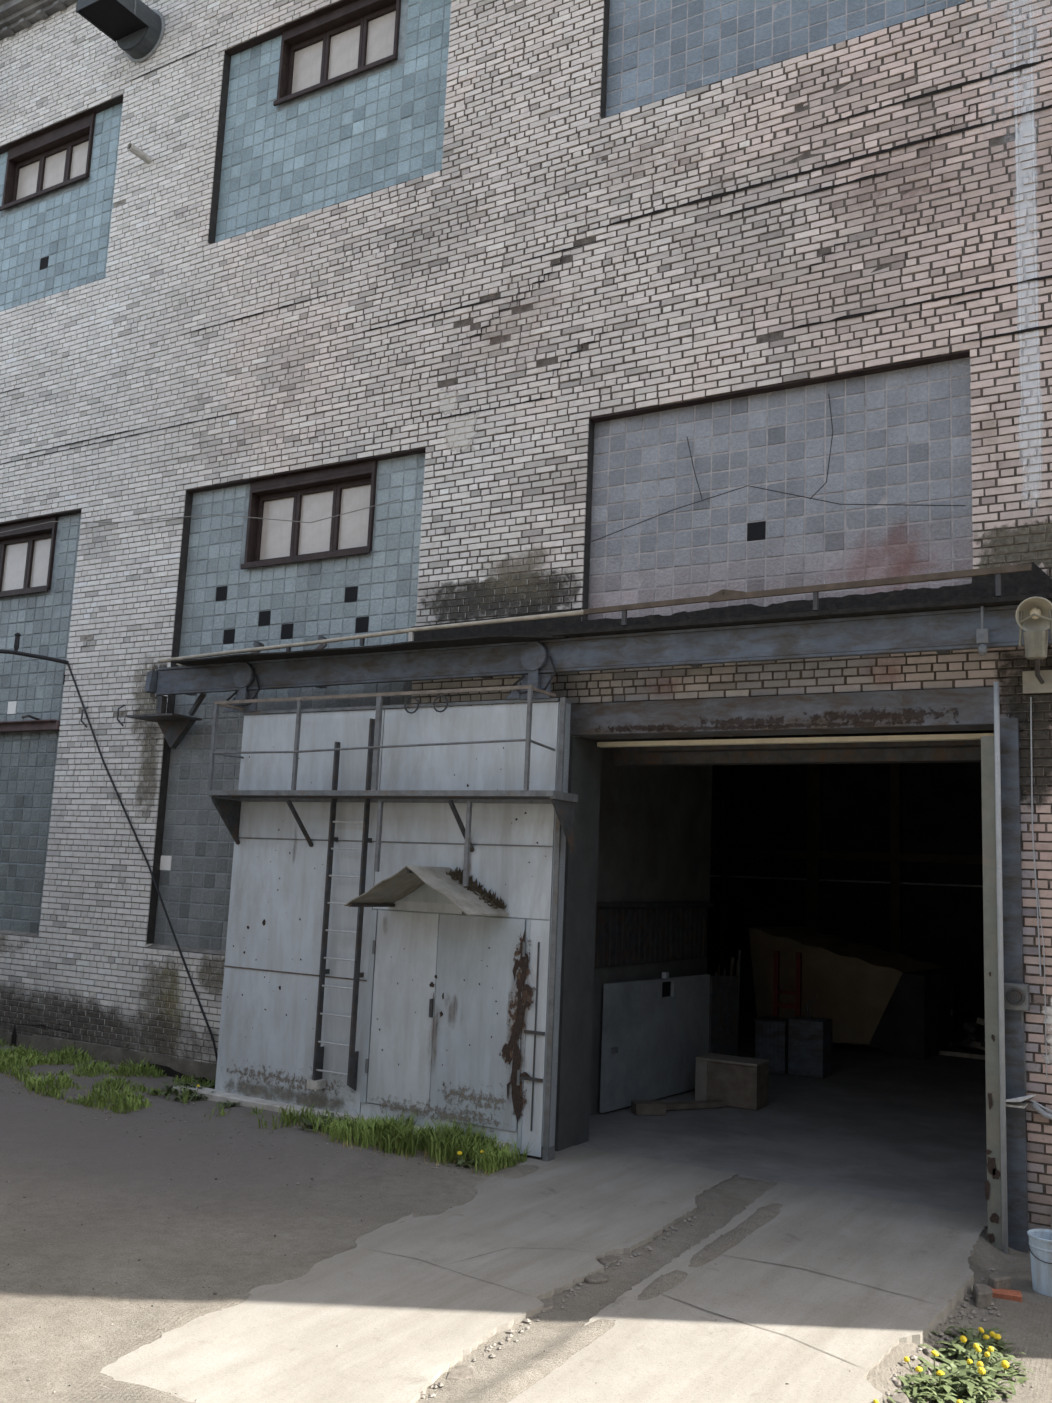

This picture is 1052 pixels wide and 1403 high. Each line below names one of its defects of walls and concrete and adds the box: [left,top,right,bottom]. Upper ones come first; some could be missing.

leakage [1013,0,1043,506]
leakage [422,549,581,623]
leakage [140,967,181,1057]
leakage [199,956,225,992]
corrosion [499,931,536,1122]
crack [369,1248,600,1296]
crack [655,1291,863,1368]